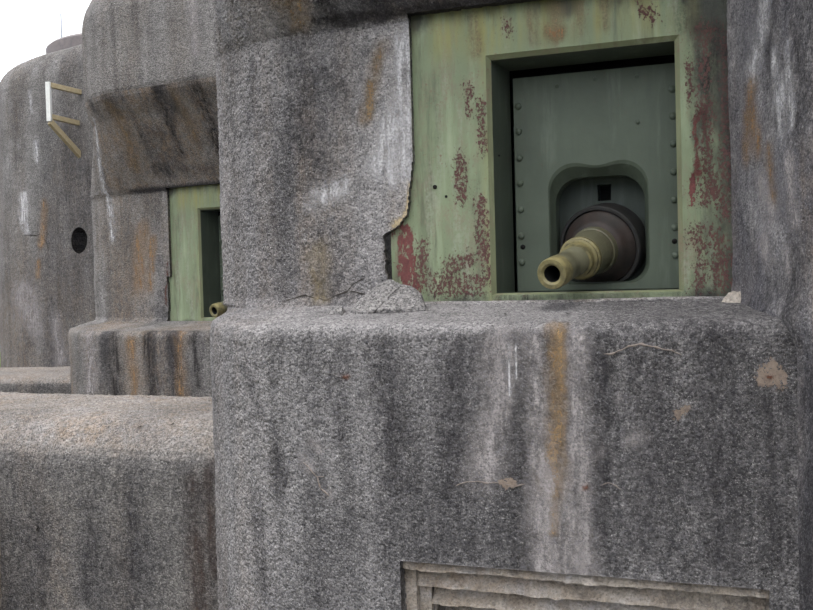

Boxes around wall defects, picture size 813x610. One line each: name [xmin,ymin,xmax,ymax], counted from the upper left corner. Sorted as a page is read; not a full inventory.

leakage [190,80,219,154]
leakage [92,117,114,241]
peeling [392,78,491,301]
crack [606,343,681,355]
spalling [754,357,788,392]